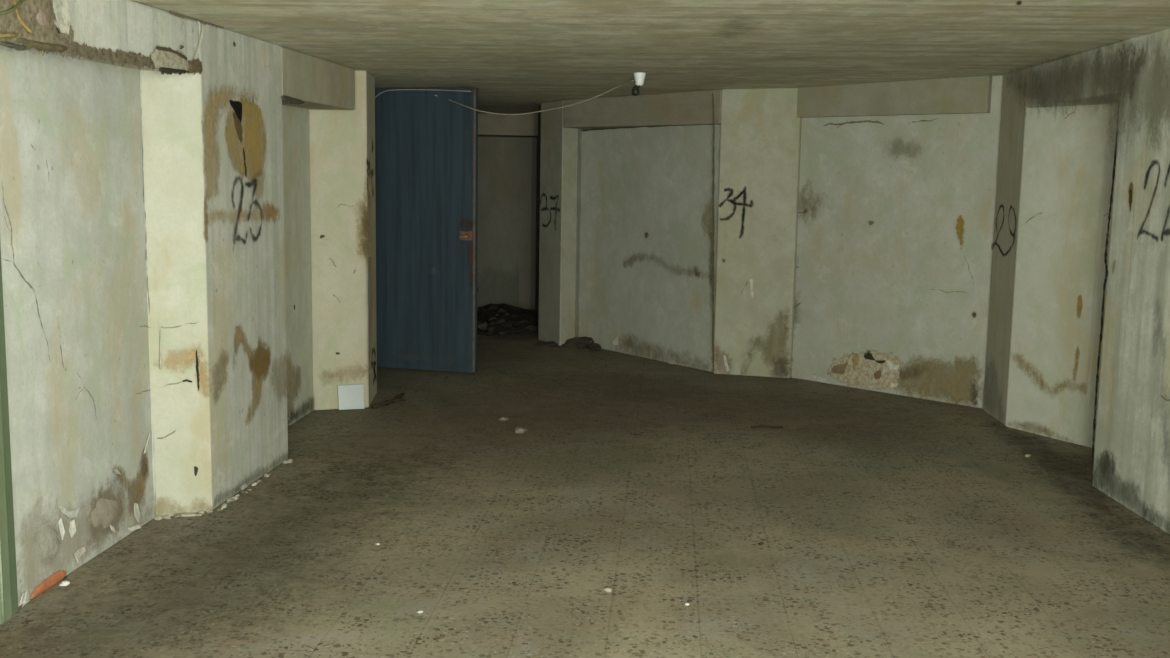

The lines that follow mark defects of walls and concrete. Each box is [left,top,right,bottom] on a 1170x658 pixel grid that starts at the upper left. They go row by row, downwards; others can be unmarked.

spalling [0,0,203,75]
water stain [1008,49,1170,132]
water stain [204,90,254,198]
water stain [214,326,299,420]
spalling [810,348,902,390]
water stain [898,360,978,405]
peeling [110,503,141,533]